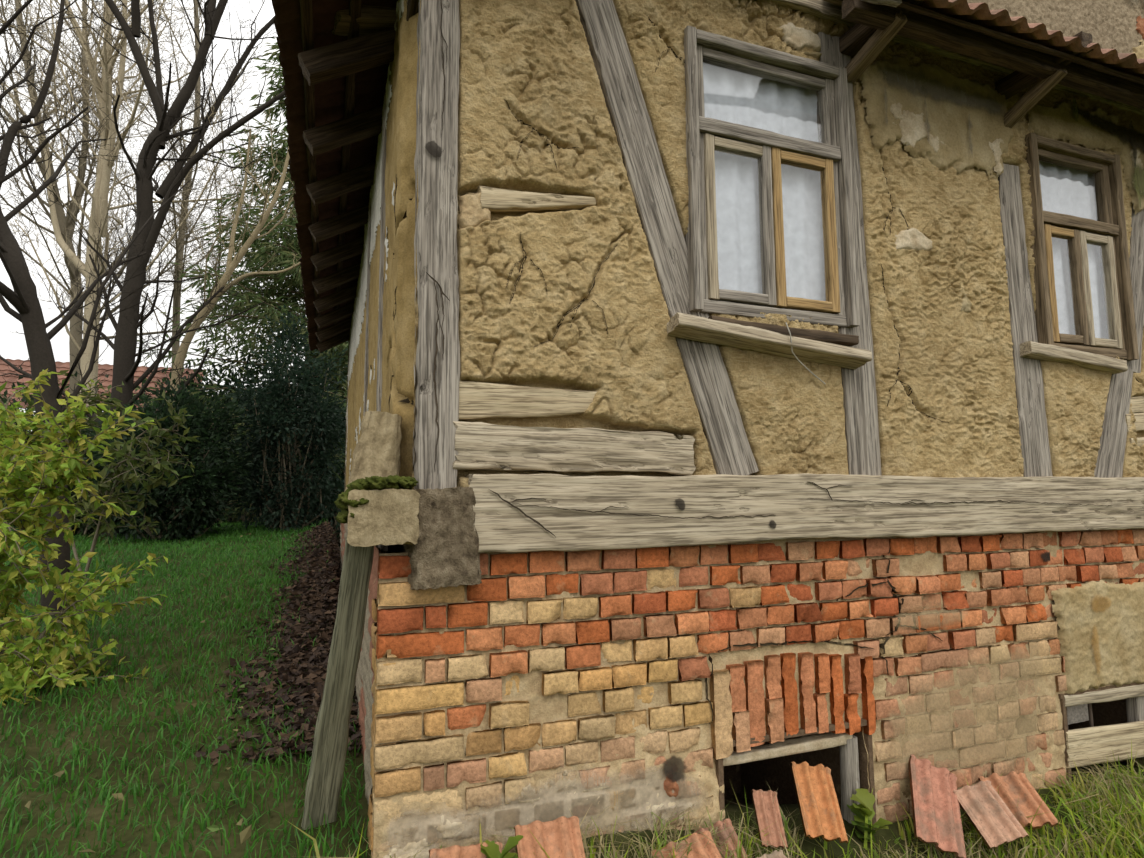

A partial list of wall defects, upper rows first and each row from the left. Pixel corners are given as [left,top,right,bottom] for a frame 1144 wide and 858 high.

crack [649,18,685,72]
crack [506,101,579,167]
peeling [348,65,395,385]
crack [882,167,909,233]
crack [505,232,547,302]
crack [539,245,617,345]
crack [880,263,949,423]
peeling [346,396,369,467]
crack [489,489,774,536]